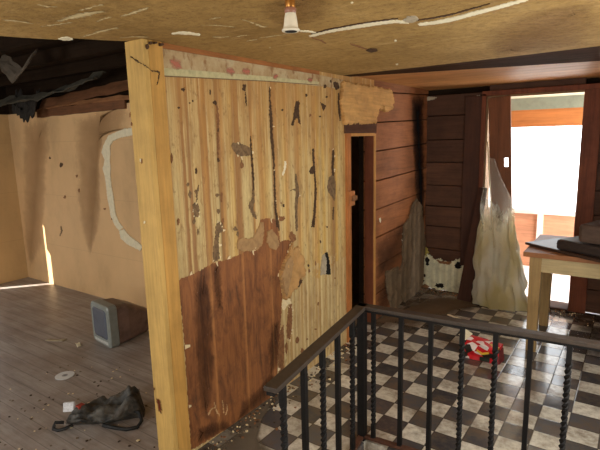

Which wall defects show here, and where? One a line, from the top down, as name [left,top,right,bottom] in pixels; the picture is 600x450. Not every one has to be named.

crack [300,0,528,53]
flaking render [339,81,395,125]
flaking render [385,199,464,308]